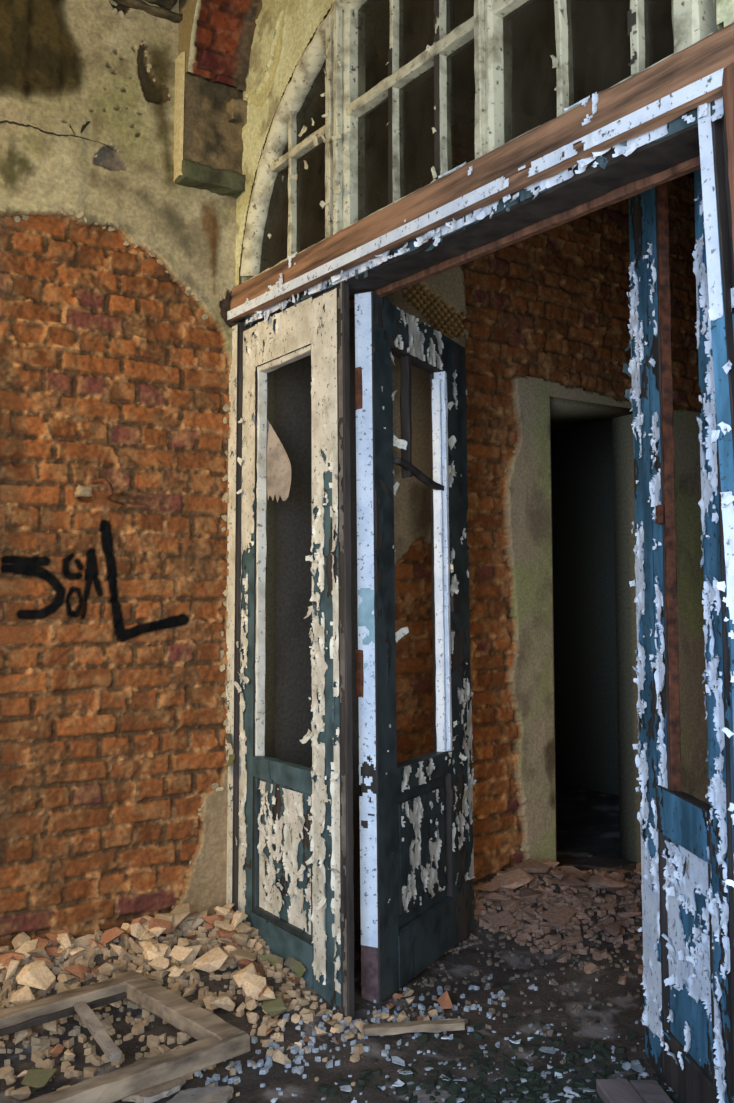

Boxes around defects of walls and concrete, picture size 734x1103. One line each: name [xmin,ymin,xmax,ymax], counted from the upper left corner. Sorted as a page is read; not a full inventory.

spalling [137,41,171,103]
crack [0,120,115,151]
spalling [94,143,126,171]
peeling [261,160,308,195]
peeling [298,112,341,149]
spalling [430,95,475,183]
peeling [518,67,725,199]
spalling [0,176,519,1016]
spalling [389,198,661,912]
peeling [629,97,734,1103]